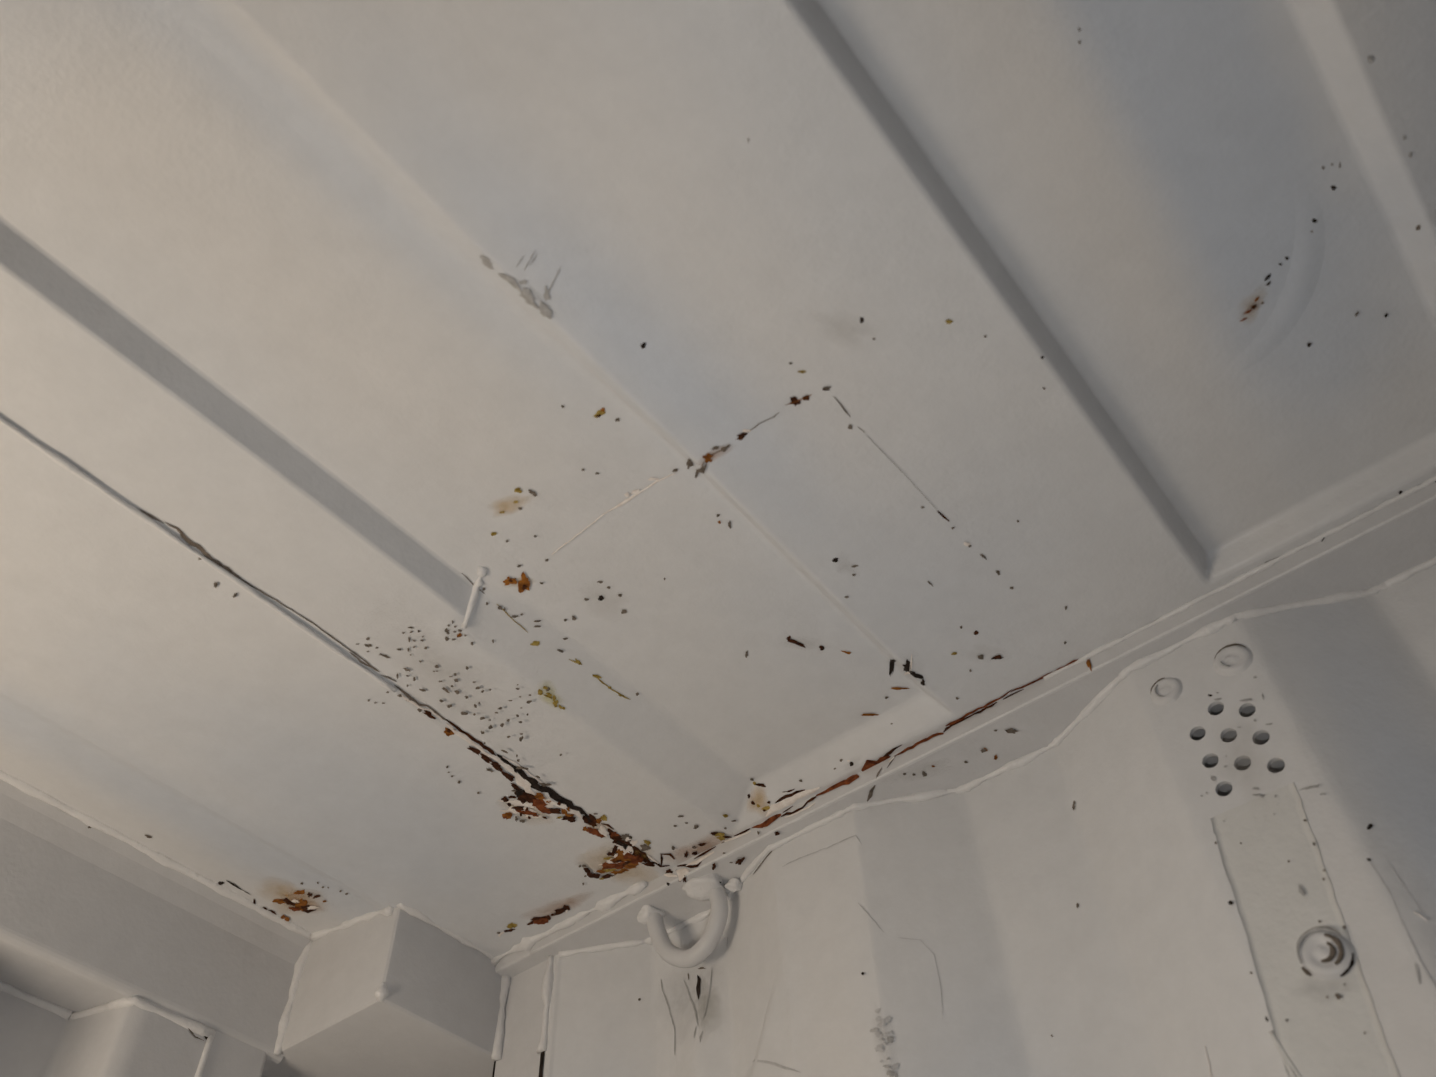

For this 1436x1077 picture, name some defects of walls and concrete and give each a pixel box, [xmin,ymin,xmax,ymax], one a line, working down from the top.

rust [1240,257,1289,322]
rust [272,882,348,922]
rust [497,905,570,937]